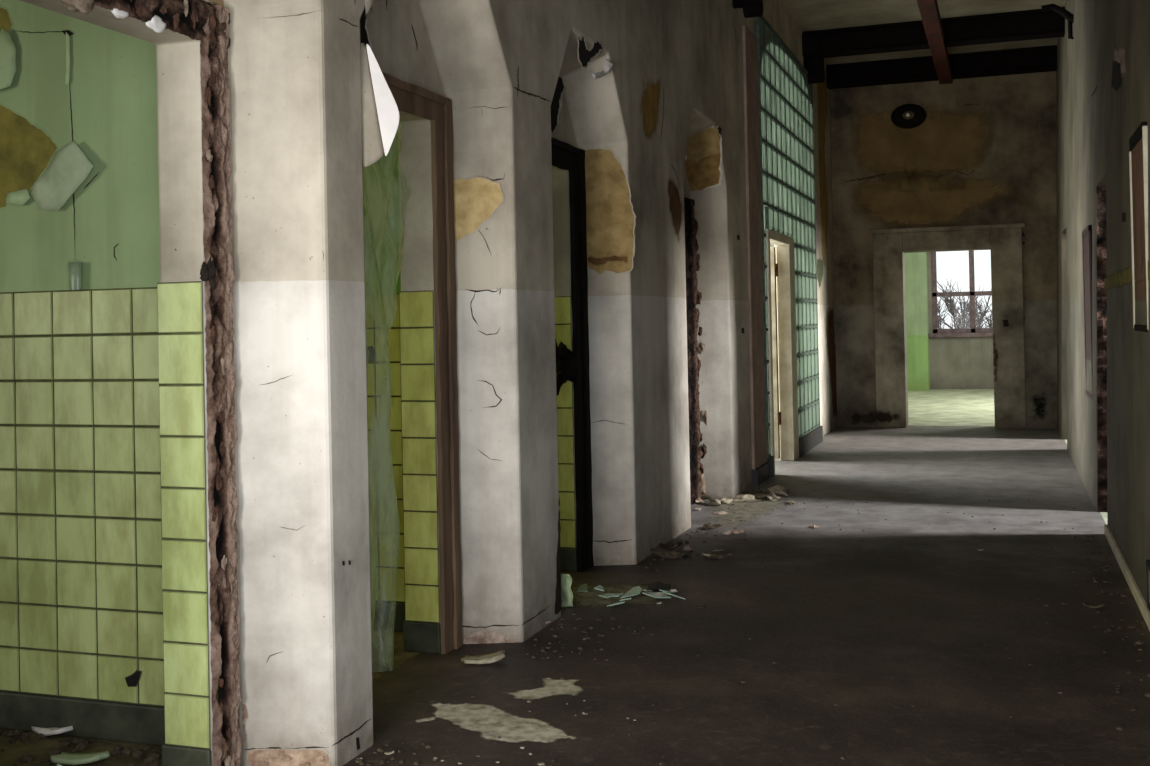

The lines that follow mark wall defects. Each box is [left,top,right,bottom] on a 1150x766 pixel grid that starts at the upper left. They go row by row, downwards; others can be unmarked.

peeling [0,5,94,211]
peeling [360,2,400,167]
flaking render [551,77,566,138]
flaking render [577,36,613,80]
peeling [453,175,505,253]
peeling [585,148,636,275]
crack [465,288,501,335]
spalling [684,124,723,505]
spalling [59,0,331,766]